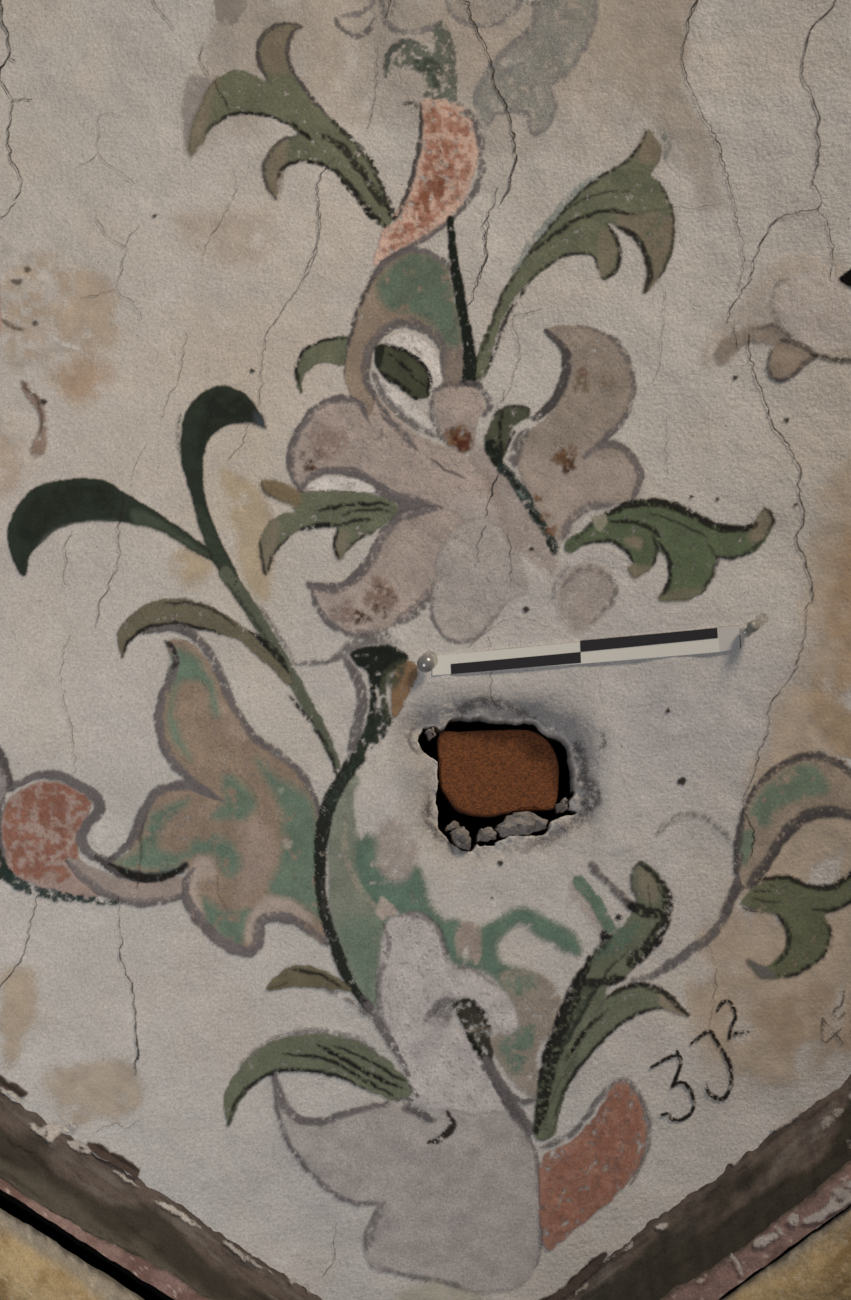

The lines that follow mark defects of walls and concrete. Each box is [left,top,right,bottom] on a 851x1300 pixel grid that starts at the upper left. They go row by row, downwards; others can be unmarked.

crack [0,0,32,217]
crack [463,0,517,304]
crack [654,0,836,854]
water stain [750,470,851,788]
crack [118,898,139,1076]
water stain [689,813,851,1084]